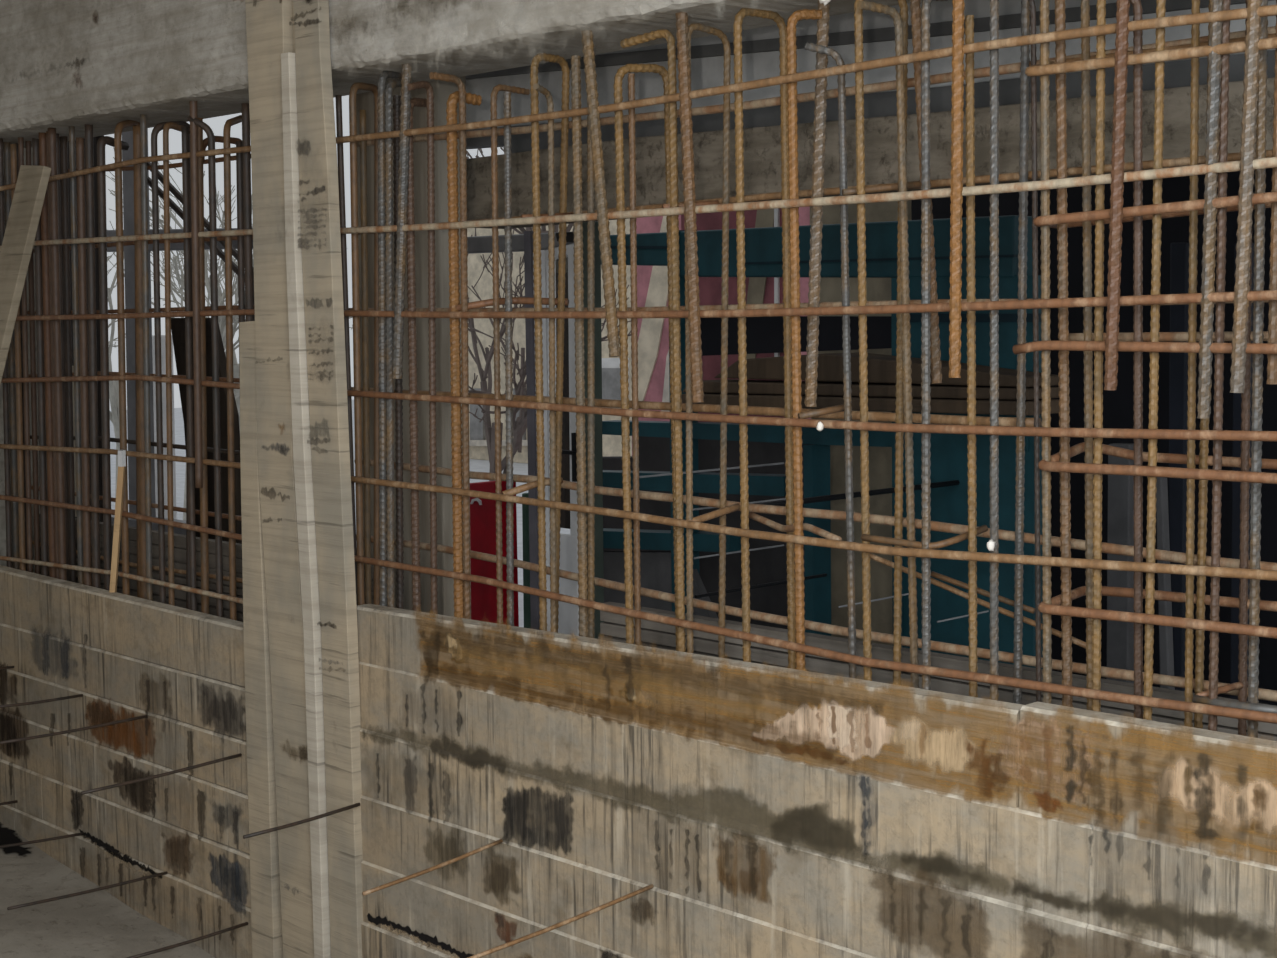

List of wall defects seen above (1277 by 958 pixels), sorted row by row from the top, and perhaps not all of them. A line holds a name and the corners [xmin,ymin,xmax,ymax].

damp [0,664,28,794]
rust [85,699,155,758]
damp [109,757,168,818]
damp [187,685,246,843]
damp [363,610,1277,958]
peeling [753,700,975,772]
damp [208,853,248,940]